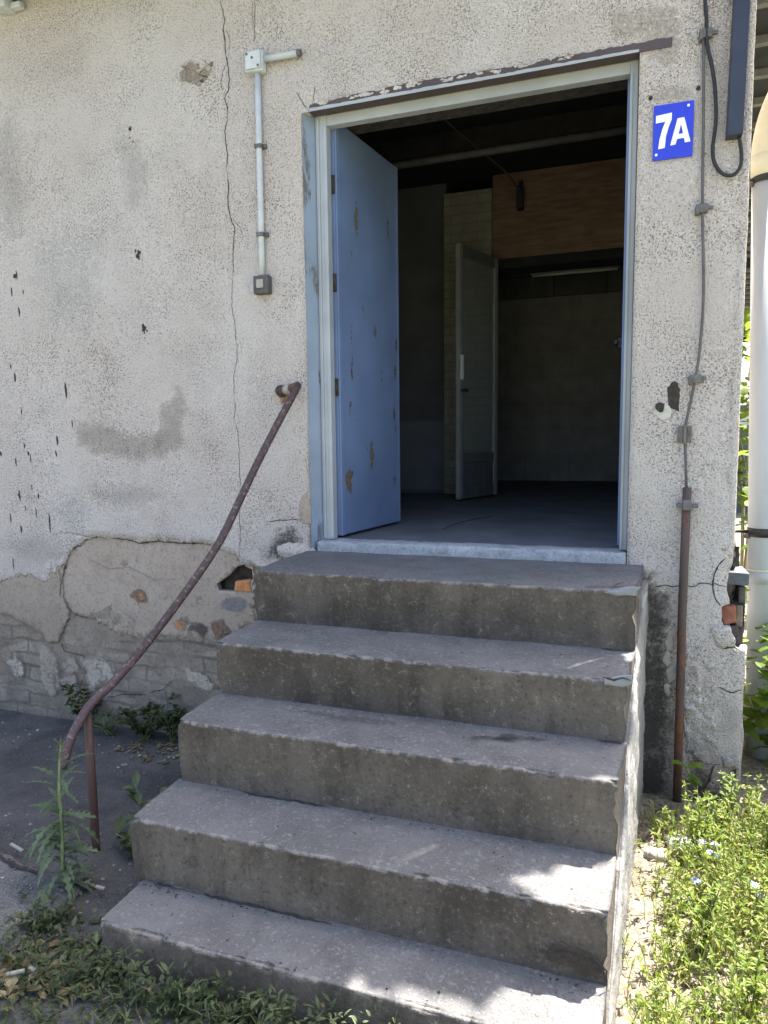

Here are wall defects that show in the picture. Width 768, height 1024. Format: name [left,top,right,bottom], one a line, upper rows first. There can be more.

peeling [318,64,517,105]
crack [220,0,256,483]
flaking render [654,402,672,421]
flaking render [0,536,256,643]
water stain [643,573,672,795]
flaking render [662,546,750,783]